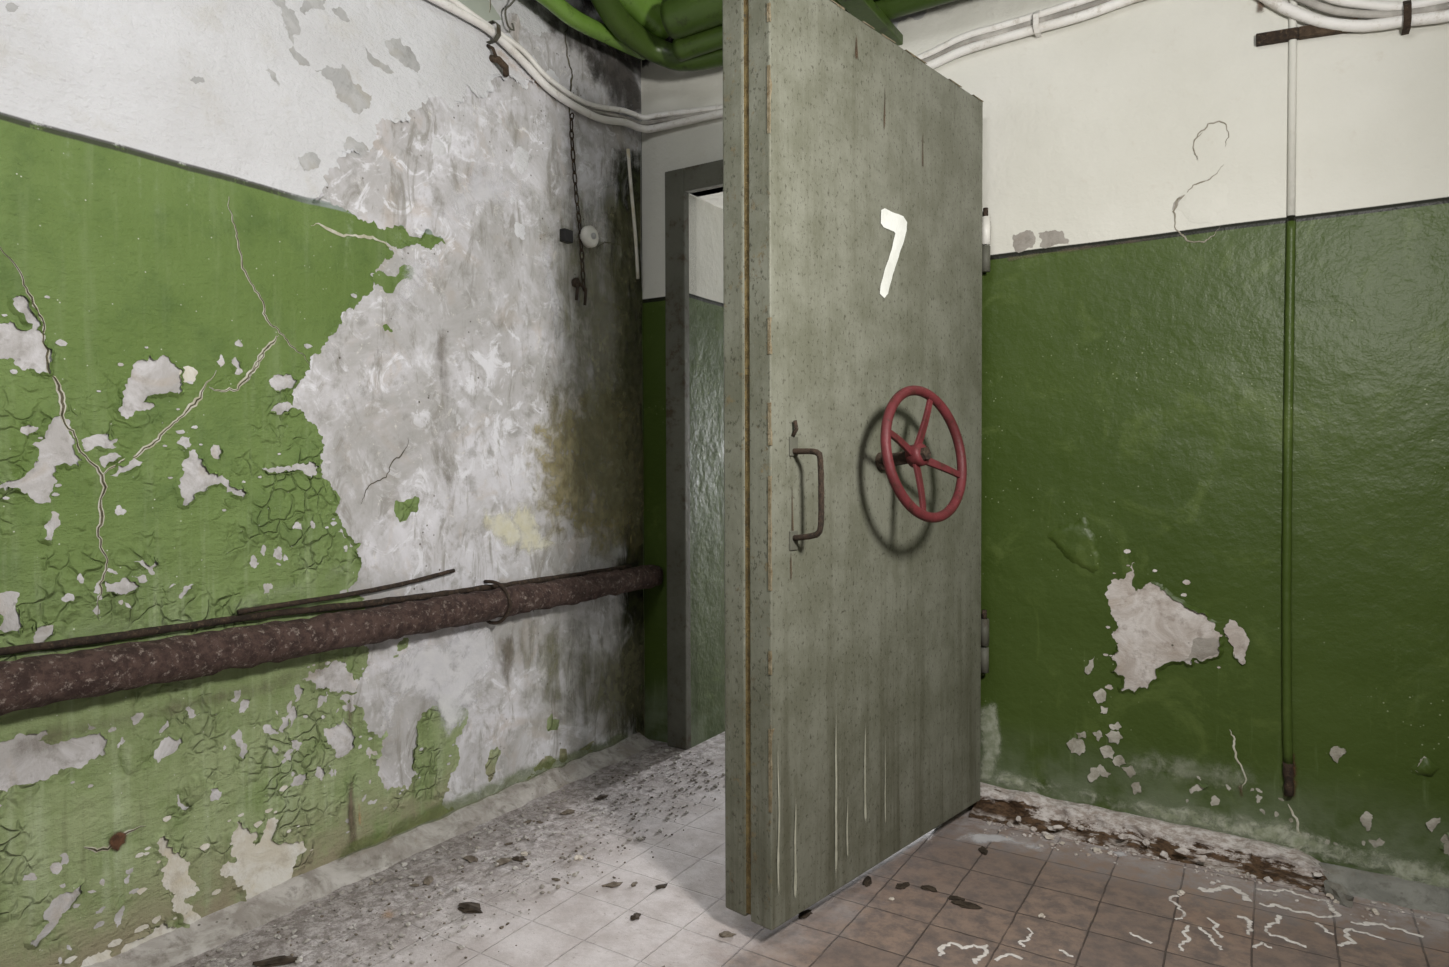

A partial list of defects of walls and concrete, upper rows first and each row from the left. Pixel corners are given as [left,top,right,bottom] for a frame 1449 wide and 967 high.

peeling [0,347,198,546]
crack [0,198,311,621]
crack [311,223,396,251]
crack [362,440,409,500]
peeling [163,0,642,610]
leakage [484,151,644,567]
crack [1172,121,1229,243]
peeling [263,593,640,810]
leakage [540,589,645,733]
peeling [1067,549,1250,795]
leakage [974,834,1010,842]
leakage [1137,803,1449,888]